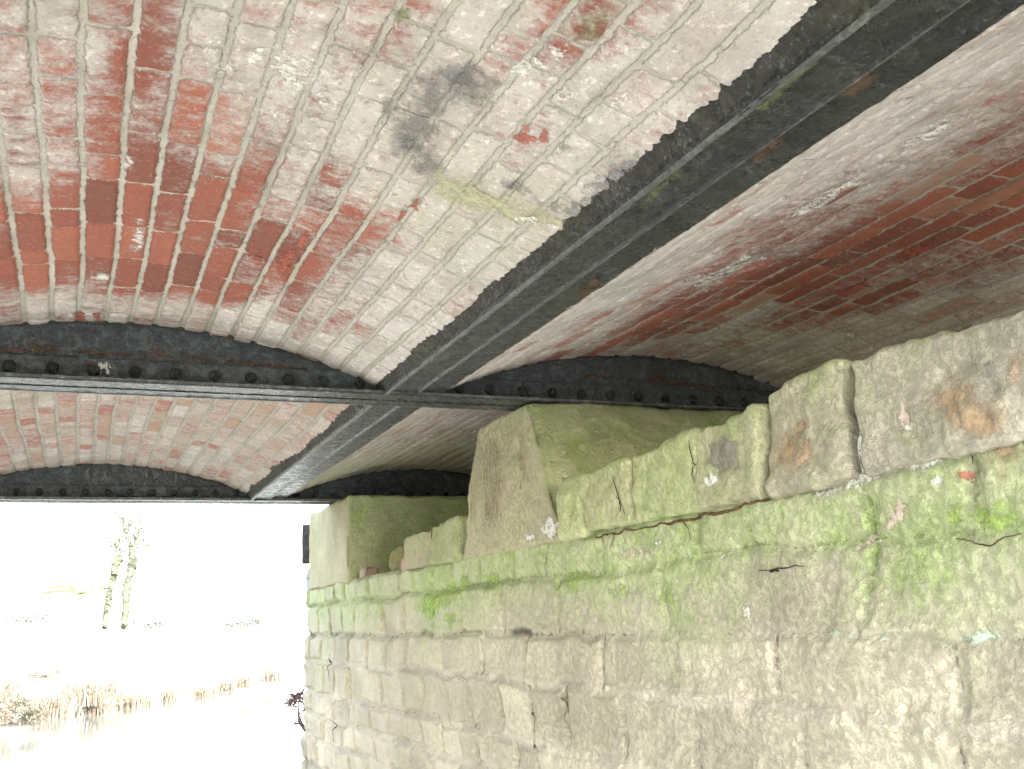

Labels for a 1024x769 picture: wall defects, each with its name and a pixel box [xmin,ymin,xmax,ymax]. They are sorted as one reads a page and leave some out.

damp [506,39,567,79]
spalling [513,125,549,144]
damp [392,134,638,230]
rust [939,386,1005,434]
crack [595,479,771,548]
crack [956,533,1021,547]
crack [758,565,804,573]